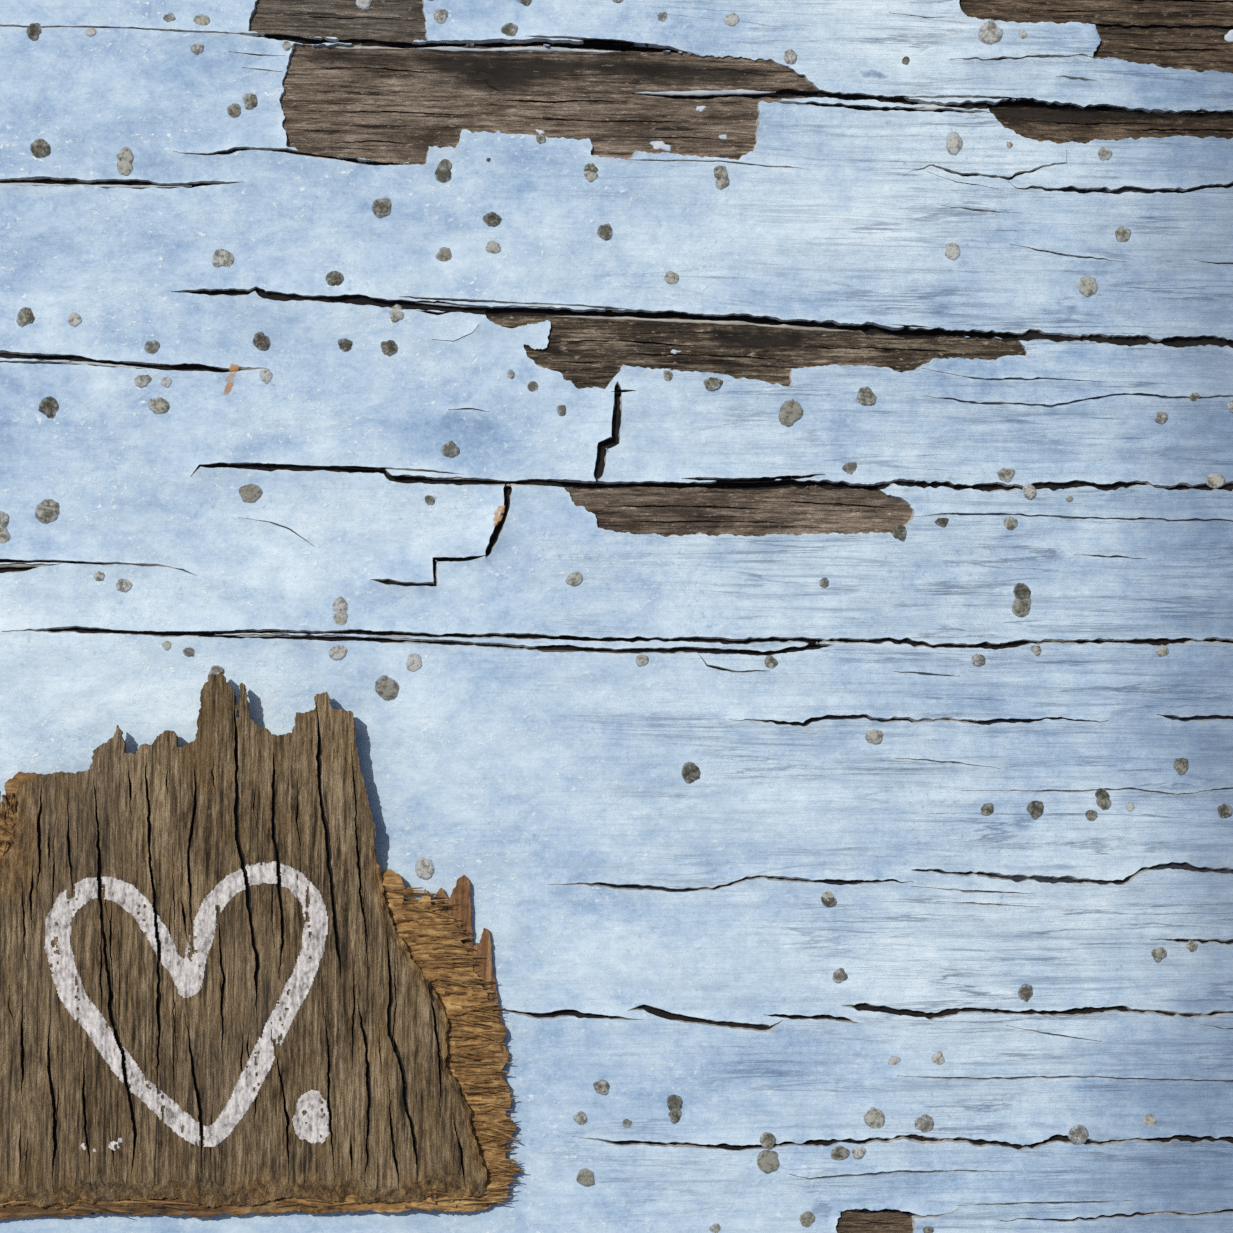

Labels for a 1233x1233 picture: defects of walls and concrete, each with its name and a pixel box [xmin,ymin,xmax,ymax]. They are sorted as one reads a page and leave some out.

peeling [959,0,1233,73]
peeling [250,0,818,165]
peeling [989,106,1233,144]
crack [177,288,1233,348]
peeling [487,315,1026,389]
crack [192,384,1233,587]
peeling [565,486,912,537]
crack [40,627,1233,676]
crack [590,862,1233,905]
crack [502,1003,1233,1041]
crack [607,1134,1233,1179]
peeling [836,1208,913,1233]